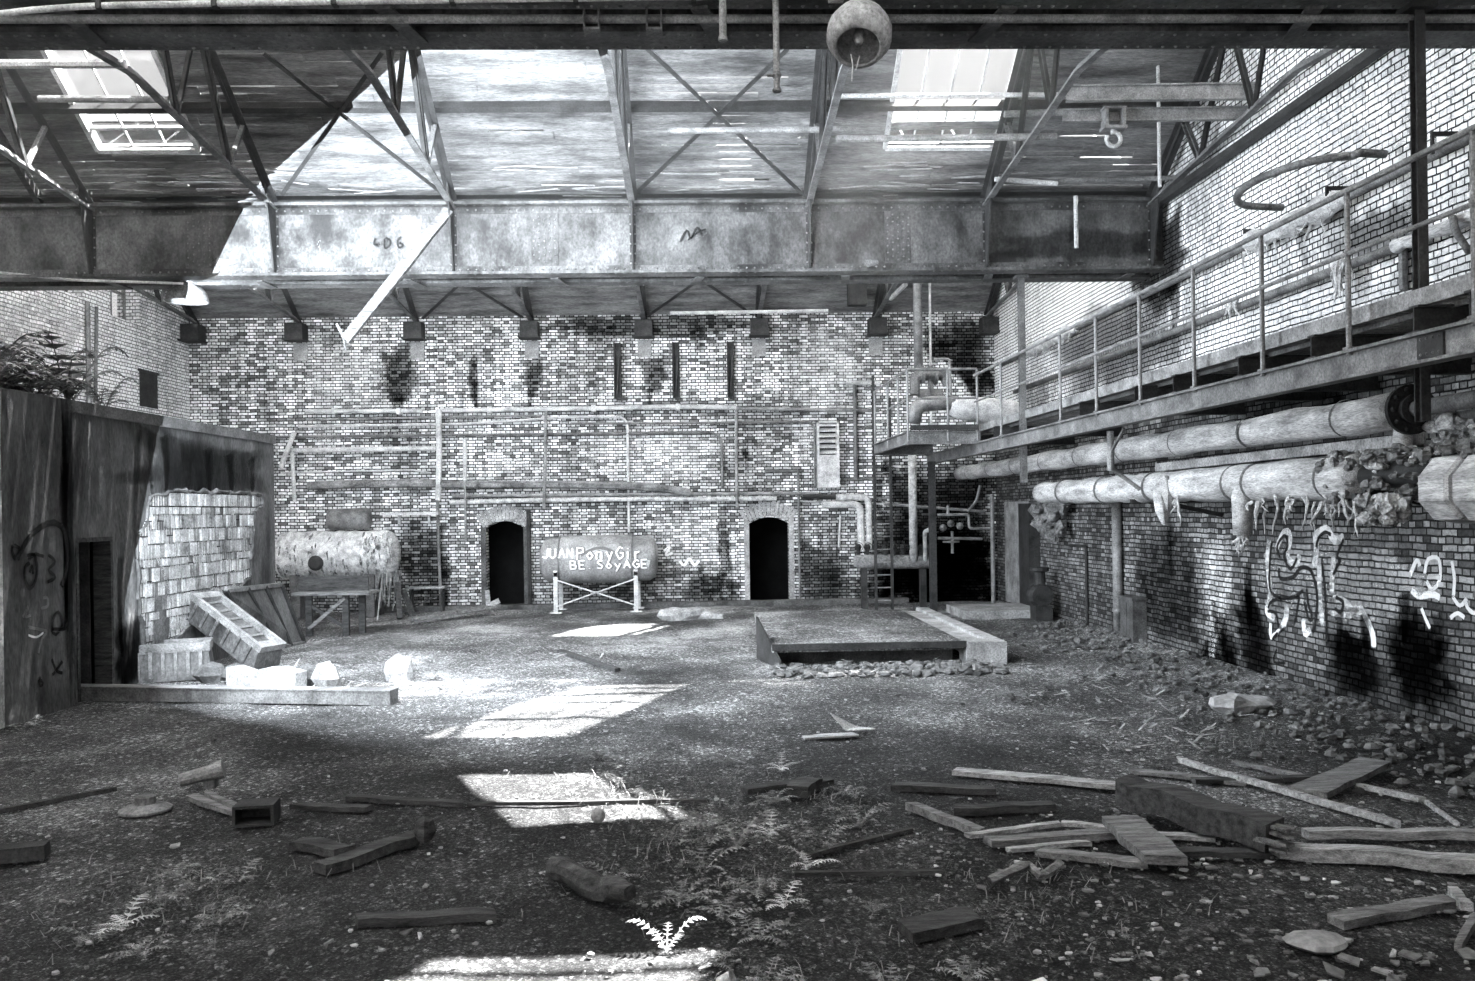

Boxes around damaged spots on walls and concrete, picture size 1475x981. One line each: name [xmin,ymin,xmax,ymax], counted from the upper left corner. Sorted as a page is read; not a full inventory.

damp [1294,559,1456,712]